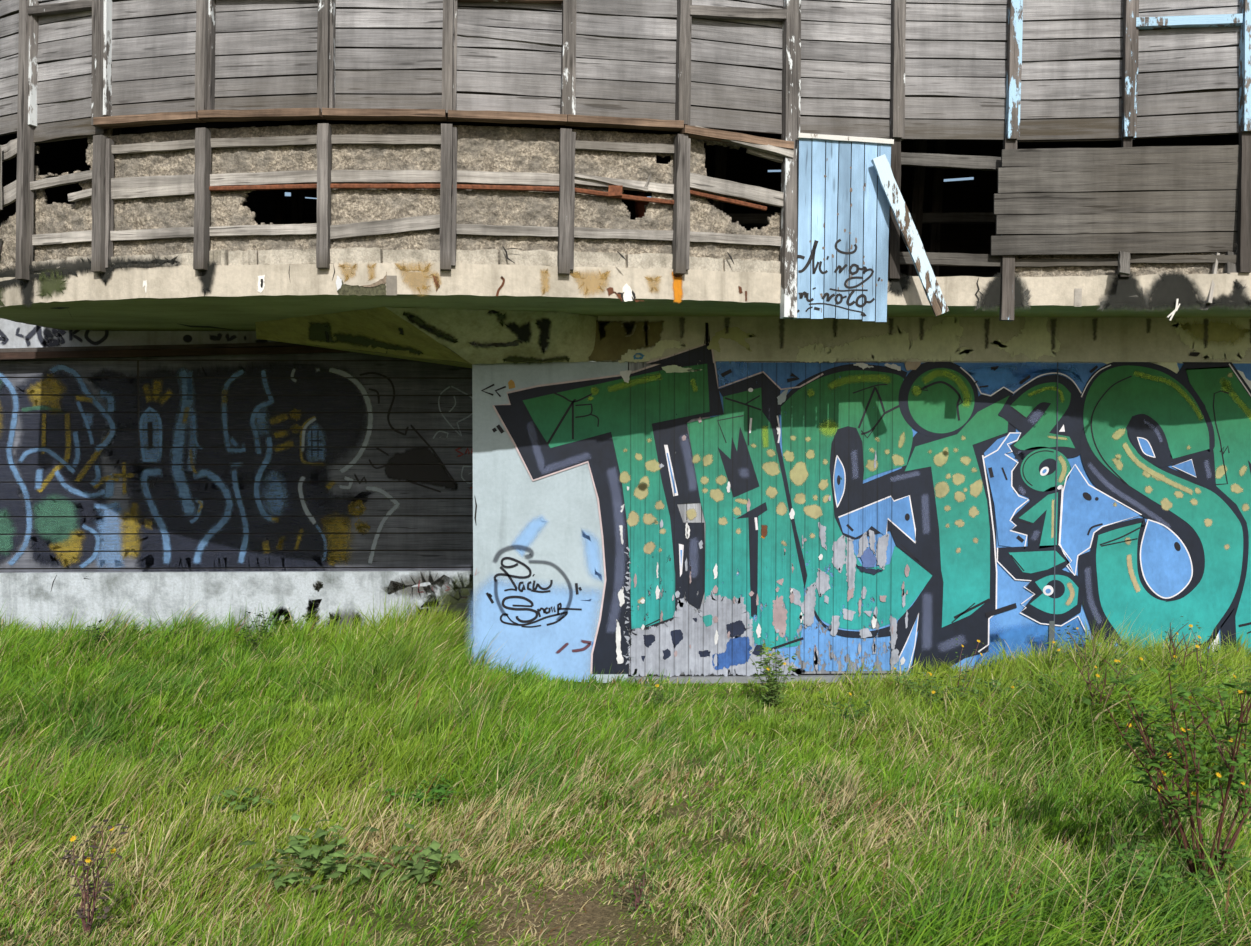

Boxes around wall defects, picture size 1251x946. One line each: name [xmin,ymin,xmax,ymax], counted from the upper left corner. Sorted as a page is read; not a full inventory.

damp [976,275,1029,309]
damp [1100,273,1251,310]
peeling [796,317,973,371]
peeling [990,317,1061,361]
peeling [1152,362,1183,373]
peeling [1171,317,1251,389]
peeling [616,505,910,677]